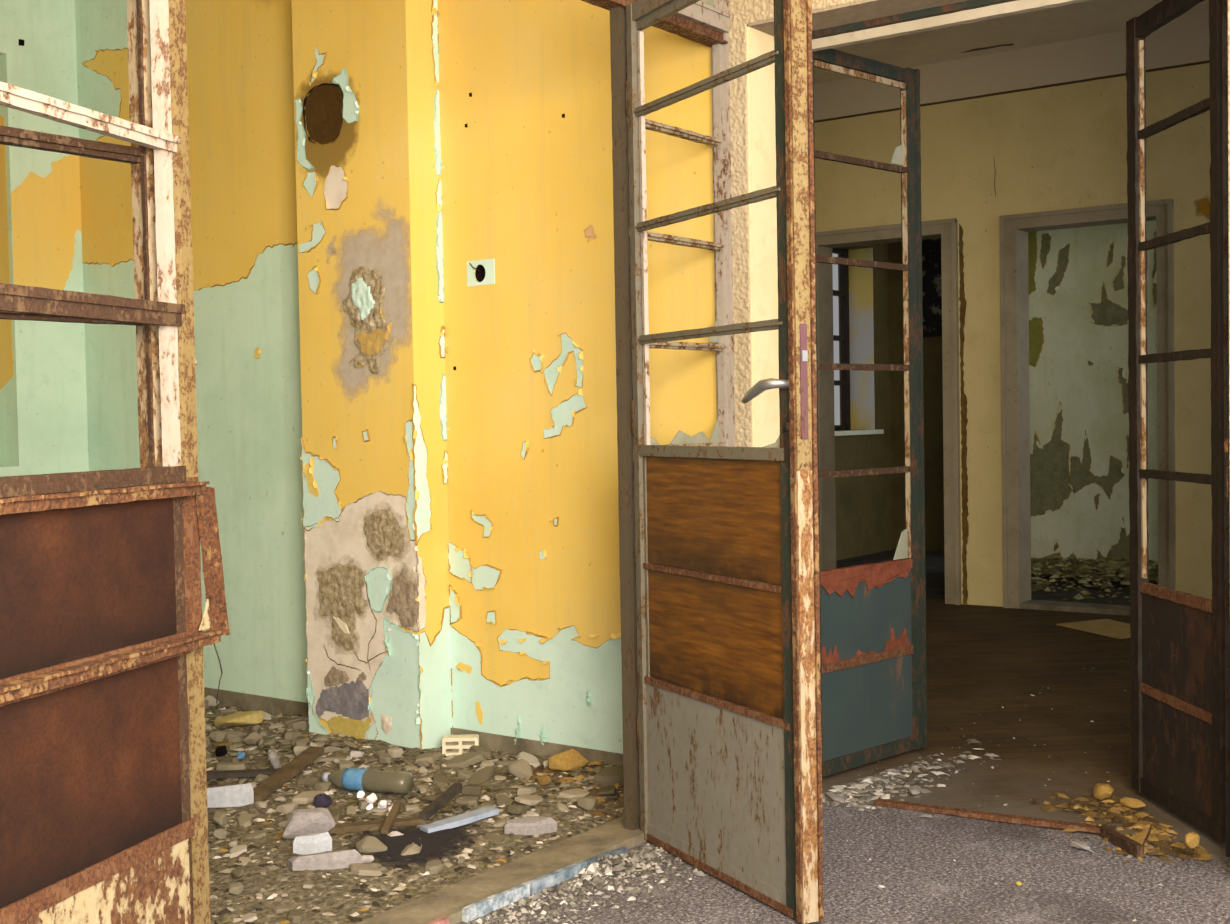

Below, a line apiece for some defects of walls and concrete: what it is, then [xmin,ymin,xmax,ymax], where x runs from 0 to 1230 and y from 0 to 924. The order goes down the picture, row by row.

peeling [0,144,134,290]
peeling [81,47,130,122]
peeling [185,0,348,294]
peeling [332,67,360,124]
peeling [431,0,445,303]
peeling [0,319,14,390]
flaking render [342,266,392,375]
peeling [438,326,447,358]
peeling [521,332,587,460]
peeling [1028,223,1130,578]
peeling [1146,220,1158,579]
peeling [300,374,623,754]